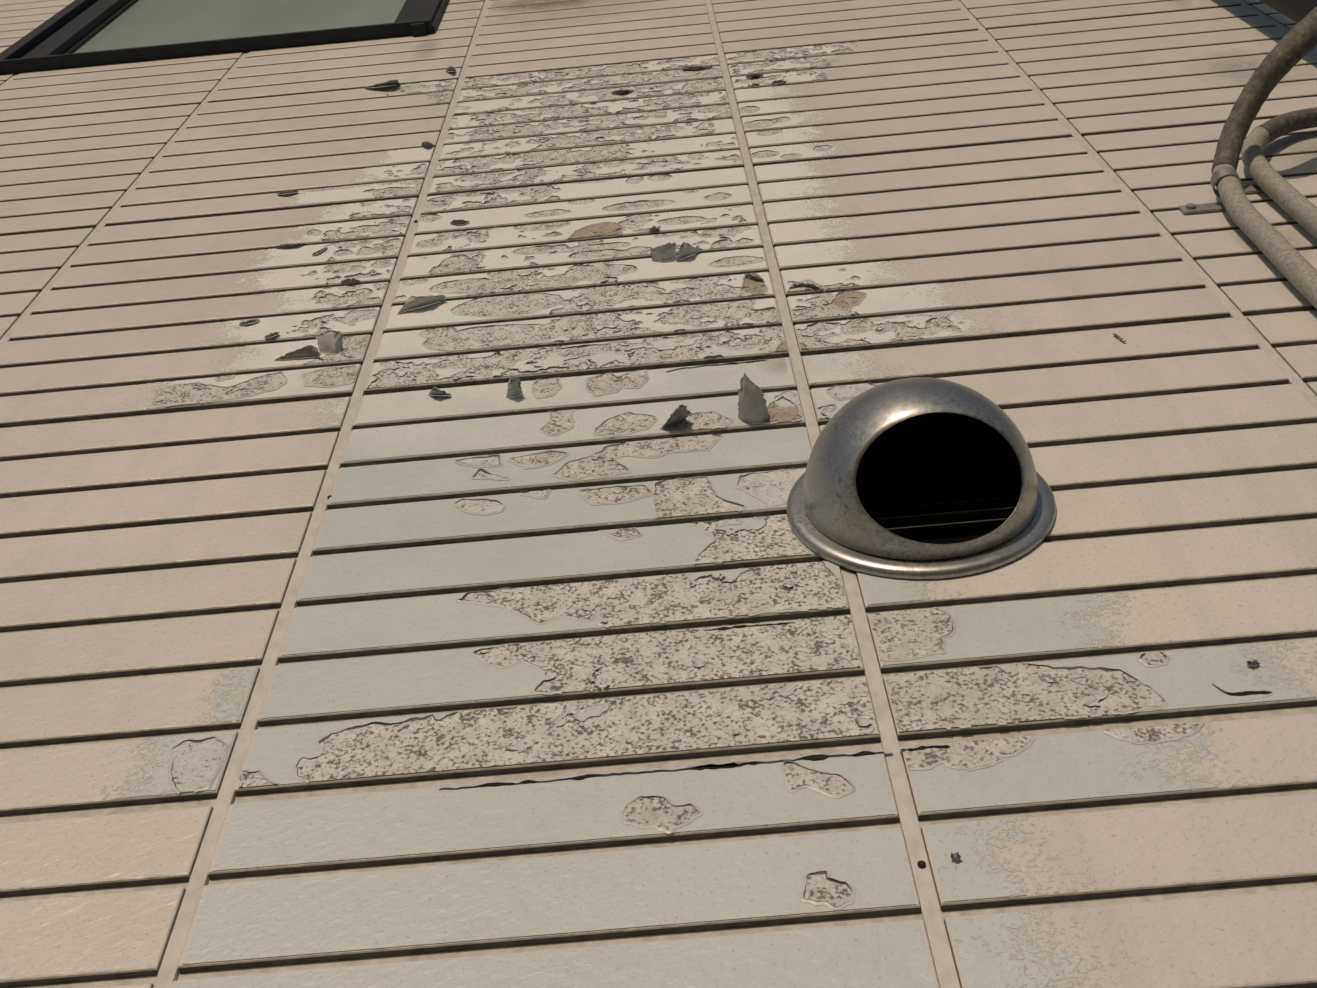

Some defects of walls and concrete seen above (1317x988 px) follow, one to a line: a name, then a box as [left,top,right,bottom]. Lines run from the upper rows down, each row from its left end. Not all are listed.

peeling [93,41,1017,988]
crack [439,743,950,789]
peeling [859,572,1317,988]